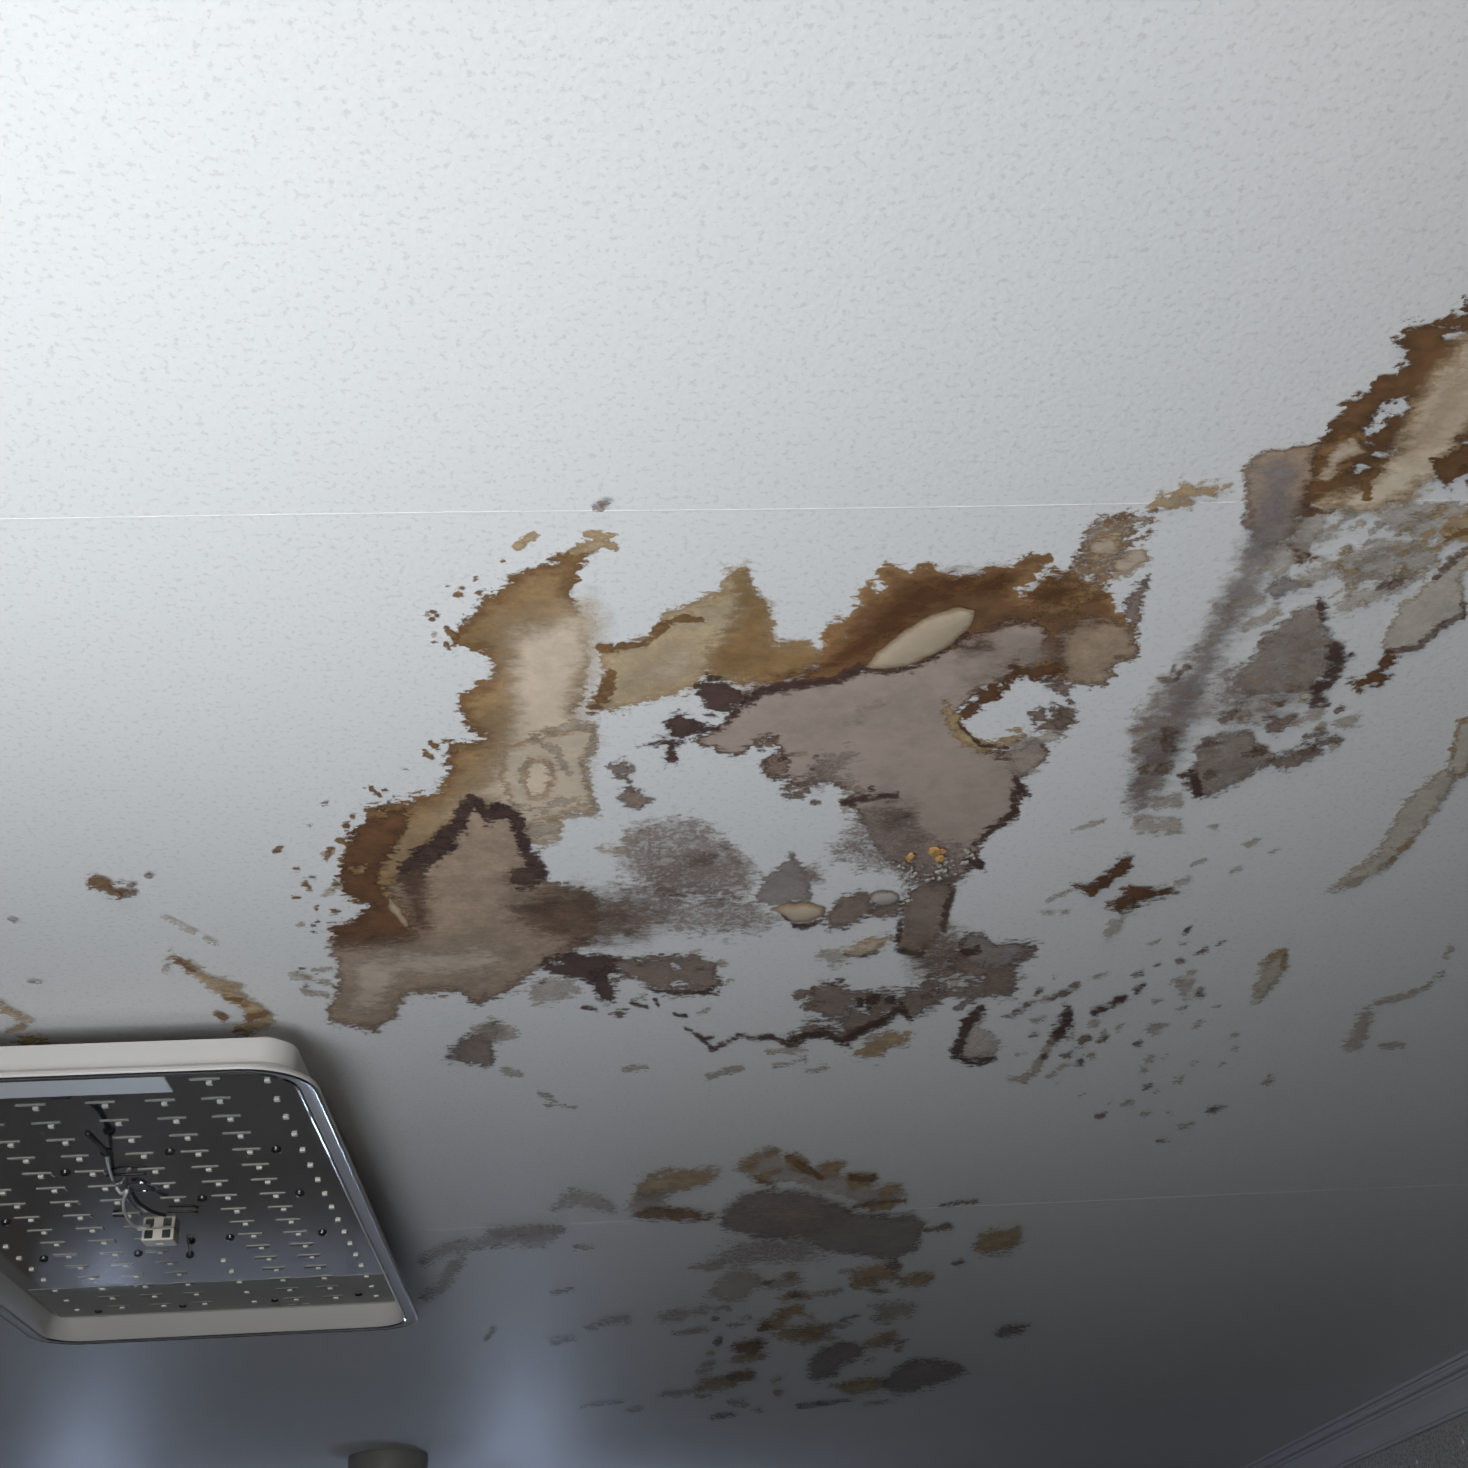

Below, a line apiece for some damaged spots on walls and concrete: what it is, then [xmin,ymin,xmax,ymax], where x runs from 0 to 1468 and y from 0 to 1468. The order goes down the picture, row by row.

water stain [288,295,1468,1119]
flaking render [891,838,976,902]
water stain [161,950,275,1038]
water stain [417,1146,979,1421]
water stain [951,1225,1023,1268]